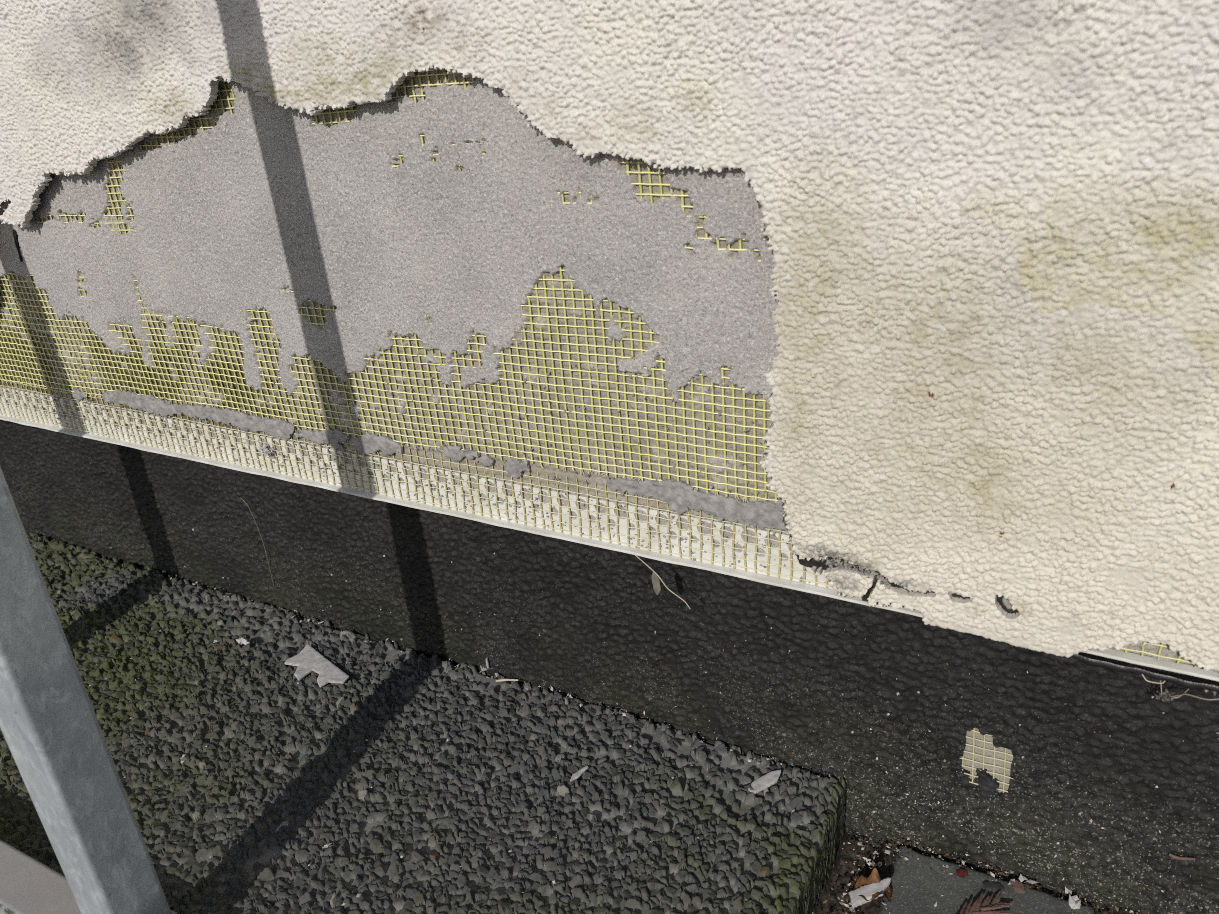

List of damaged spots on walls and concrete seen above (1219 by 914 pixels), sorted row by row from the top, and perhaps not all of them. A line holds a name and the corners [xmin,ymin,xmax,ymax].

flaking render [0,69,908,588]
crack [797,555,935,602]
flaking render [1070,642,1219,693]
peeling [960,728,1015,796]